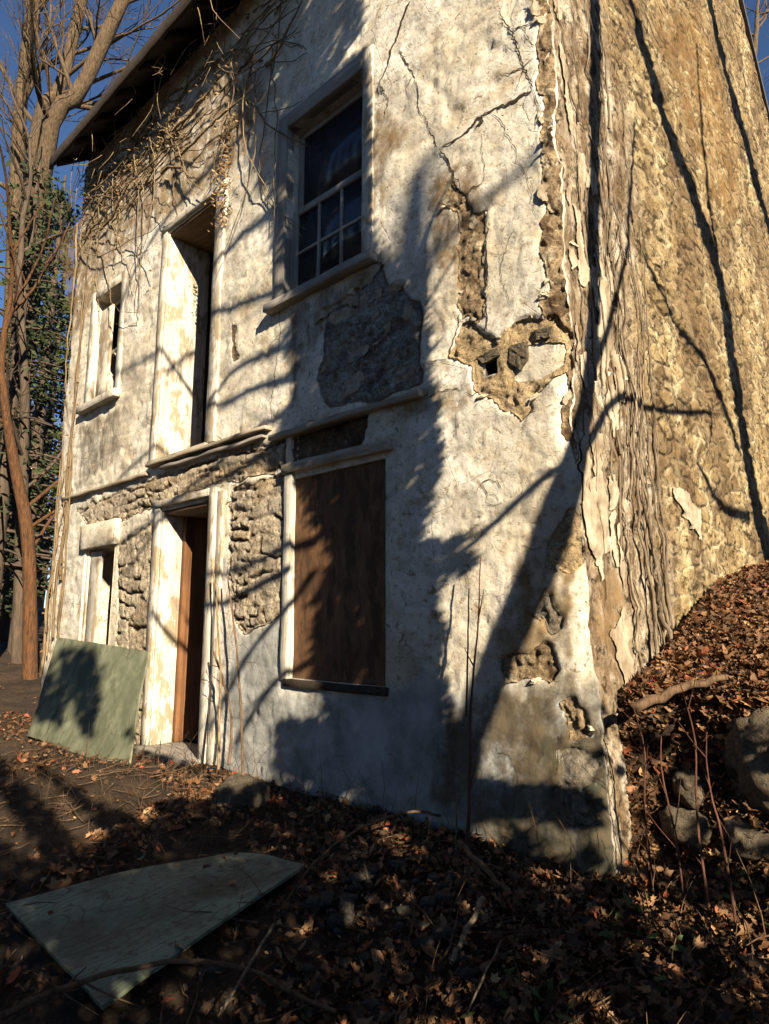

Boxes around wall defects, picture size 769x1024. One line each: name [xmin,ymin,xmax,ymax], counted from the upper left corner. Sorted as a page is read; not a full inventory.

crack [377,2,539,340]
spalling [314,262,423,407]
spalling [439,0,628,588]
flaking render [76,417,368,651]
flaking render [673,487,702,540]
flaking render [134,684,144,745]
spalling [501,594,564,688]
spalling [557,696,601,836]
flaking render [610,607,639,685]